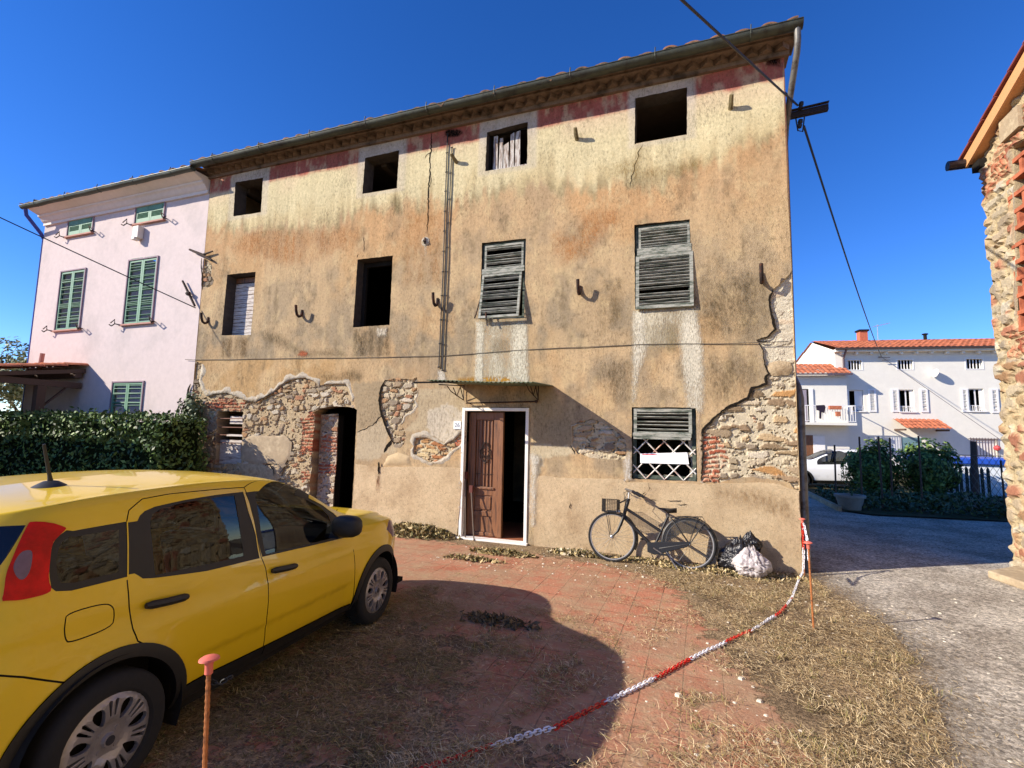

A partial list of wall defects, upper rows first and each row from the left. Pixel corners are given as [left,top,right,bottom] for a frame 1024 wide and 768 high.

peeling [193,361,355,499]
peeling [378,376,466,465]
damp [475,320,528,382]
peeling [571,419,627,460]
damp [608,283,751,467]
peeling [688,273,799,490]